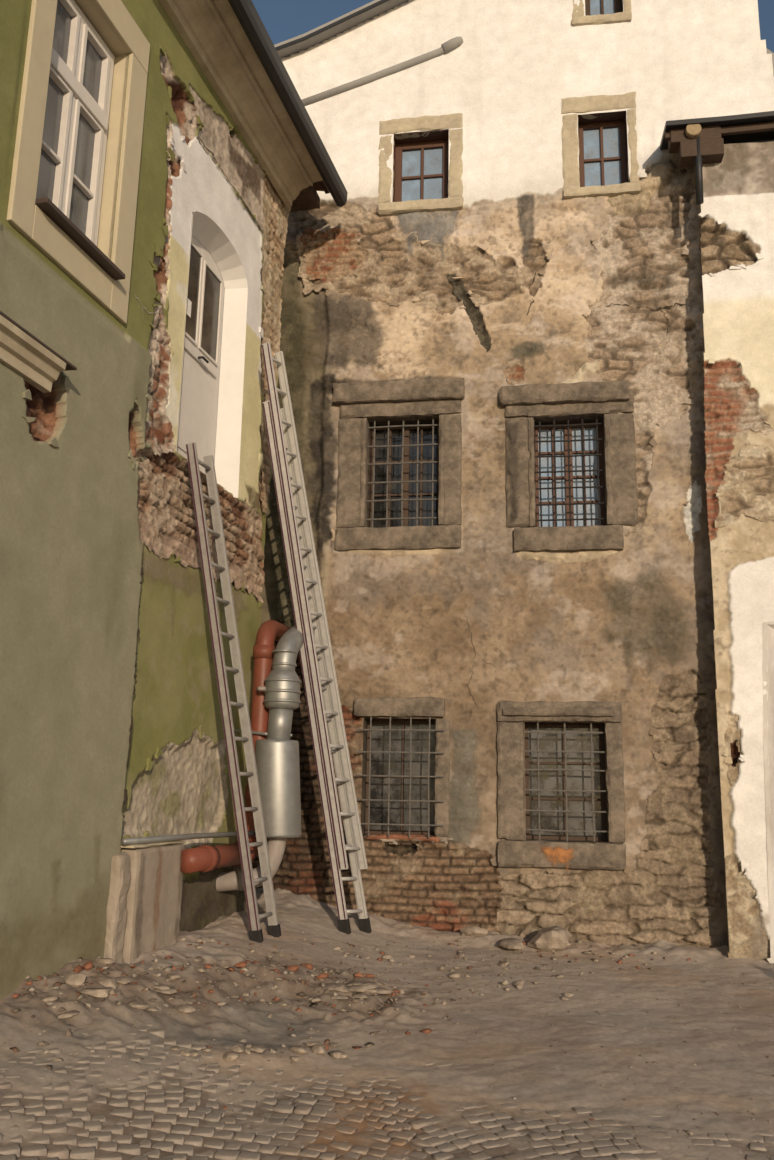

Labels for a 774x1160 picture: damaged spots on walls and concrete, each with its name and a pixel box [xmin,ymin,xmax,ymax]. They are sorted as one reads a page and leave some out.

flaking render [22,375,69,448]
spalling [128,46,552,607]
spalling [583,164,774,543]
peeling [122,725,229,849]
spalling [257,654,774,963]
rust [543,847,573,863]